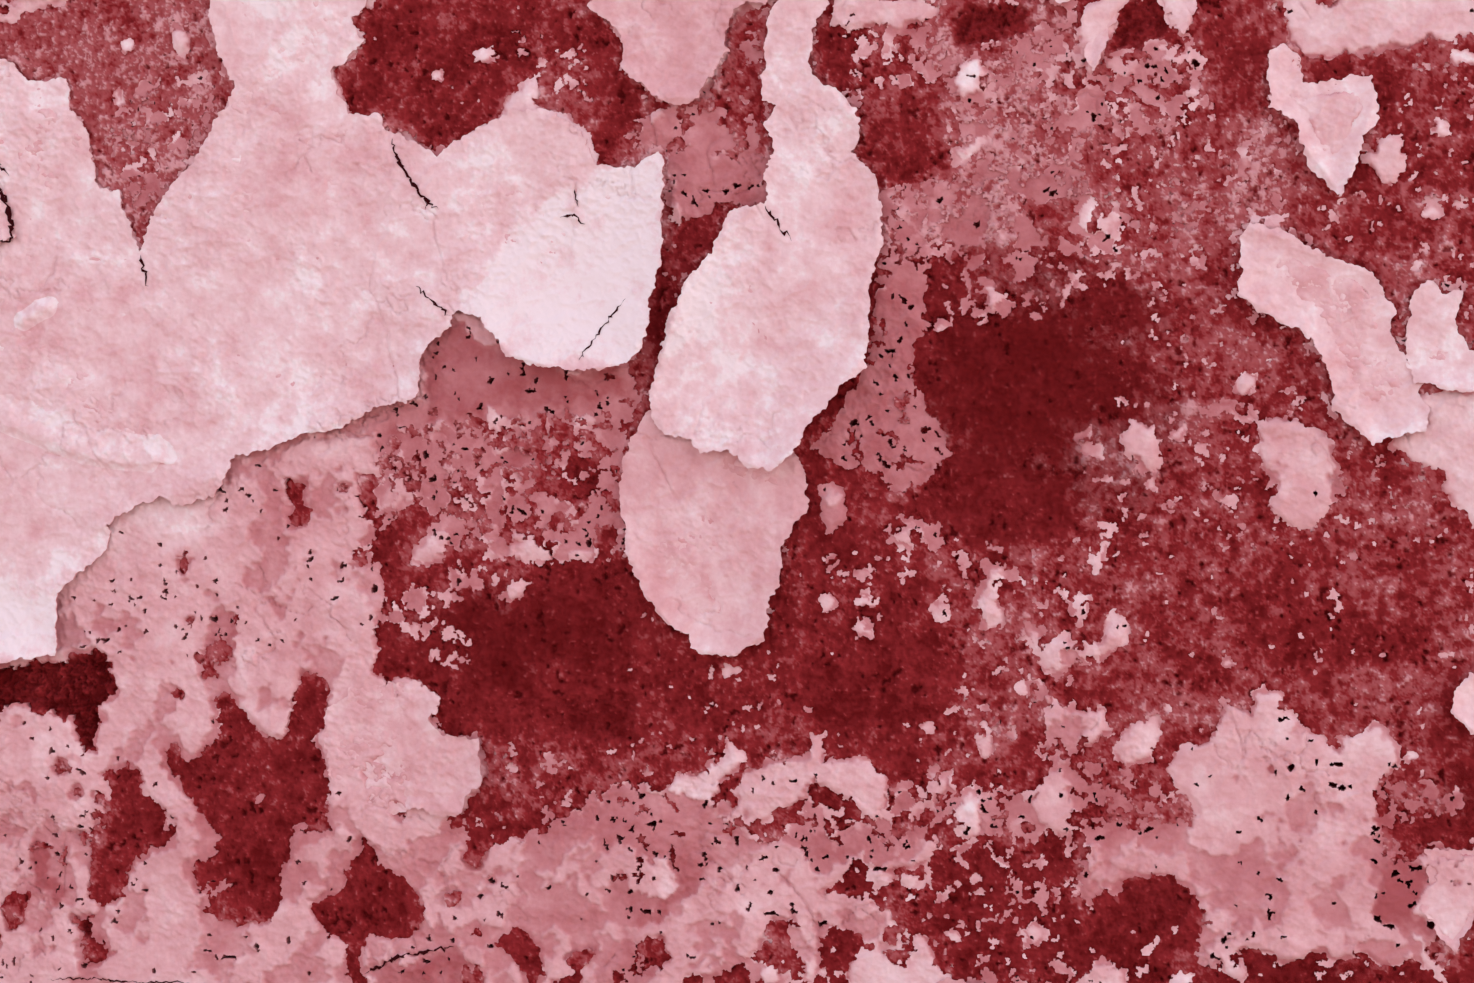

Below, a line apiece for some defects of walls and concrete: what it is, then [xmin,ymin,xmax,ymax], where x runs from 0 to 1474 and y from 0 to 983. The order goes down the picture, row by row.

crack [0,164,14,243]
peeling [0,0,907,756]
peeling [352,0,1474,983]
peeling [0,891,31,939]
peeling [29,759,177,964]
peeling [166,671,483,927]
peeling [311,837,426,983]